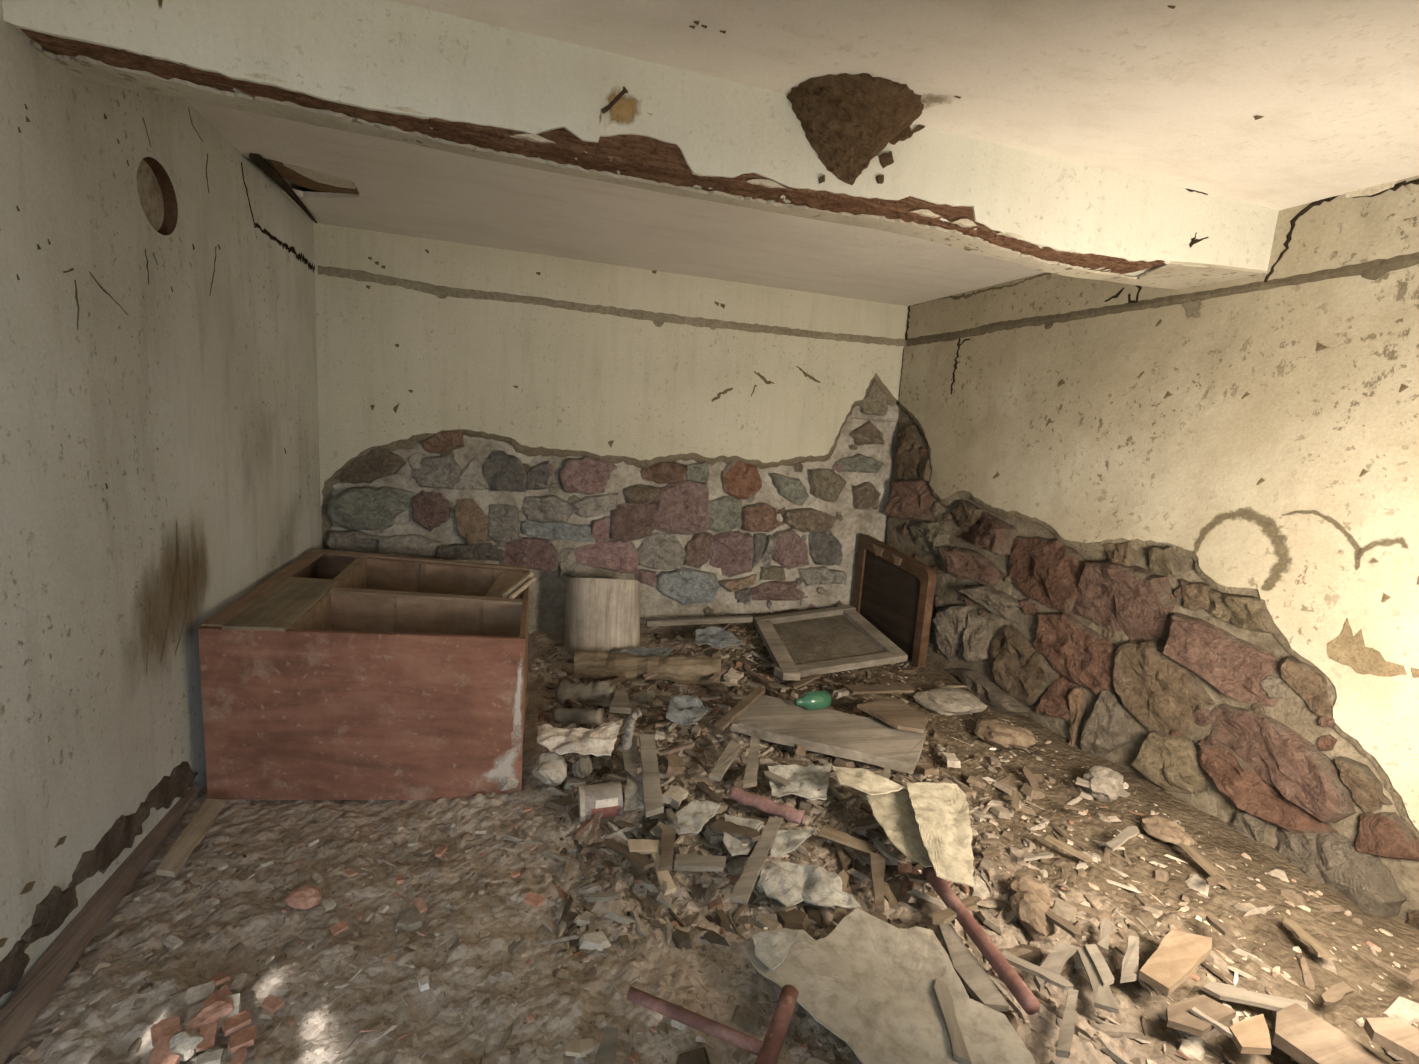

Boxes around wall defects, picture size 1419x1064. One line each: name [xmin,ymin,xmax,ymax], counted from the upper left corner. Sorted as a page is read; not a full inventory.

crack [63,268,128,330]
crack [145,249,158,285]
crack [209,246,217,296]
crack [188,108,315,273]
spalling [20,28,1165,274]
rust [600,92,652,124]
crack [1264,179,1419,282]
spalling [321,373,1260,598]
leakage [142,523,206,671]
spalling [1272,618,1419,839]
spalling [0,761,198,998]